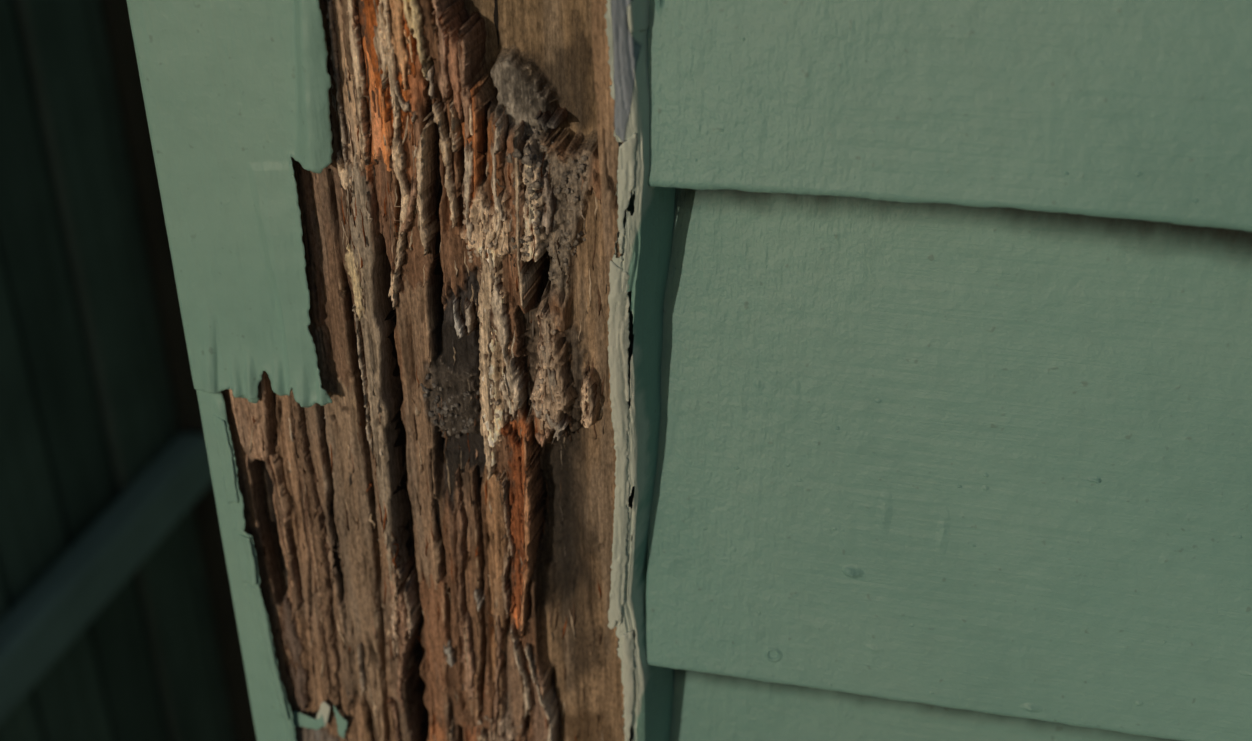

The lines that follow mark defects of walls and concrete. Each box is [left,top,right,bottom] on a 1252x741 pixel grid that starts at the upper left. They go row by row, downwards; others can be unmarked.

crack [492,0,500,48]
peeling [229,0,333,408]
crack [426,81,444,294]
peeling [213,415,238,504]
crack [264,460,287,579]
peeling [237,534,348,738]
crack [330,494,344,621]
crack [384,308,442,578]
crack [413,616,429,741]
peeling [607,0,649,741]